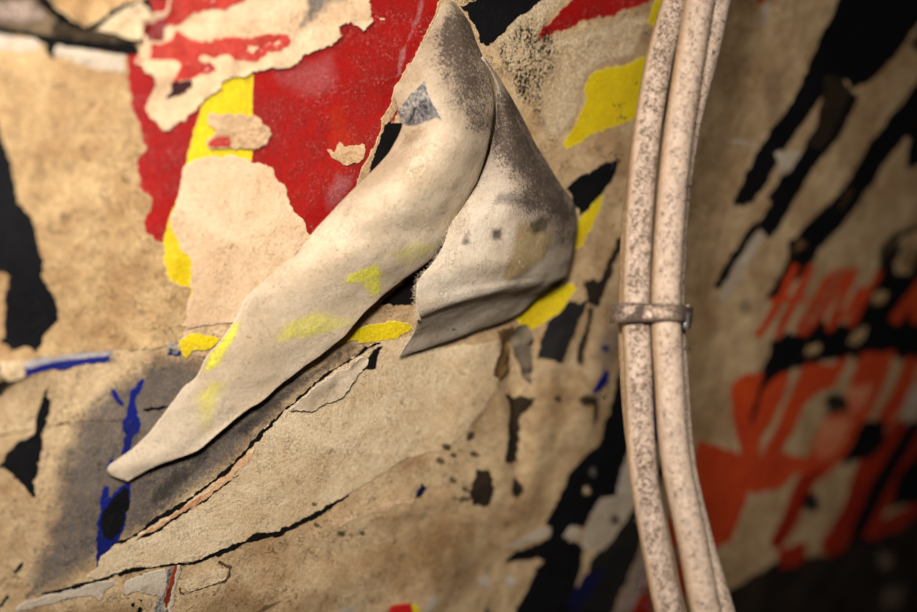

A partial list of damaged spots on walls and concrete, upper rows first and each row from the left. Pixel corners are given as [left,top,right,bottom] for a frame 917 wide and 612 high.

peeling [108,0,577,481]
crack [0,405,169,436]
crack [41,495,349,595]
crack [112,342,383,545]